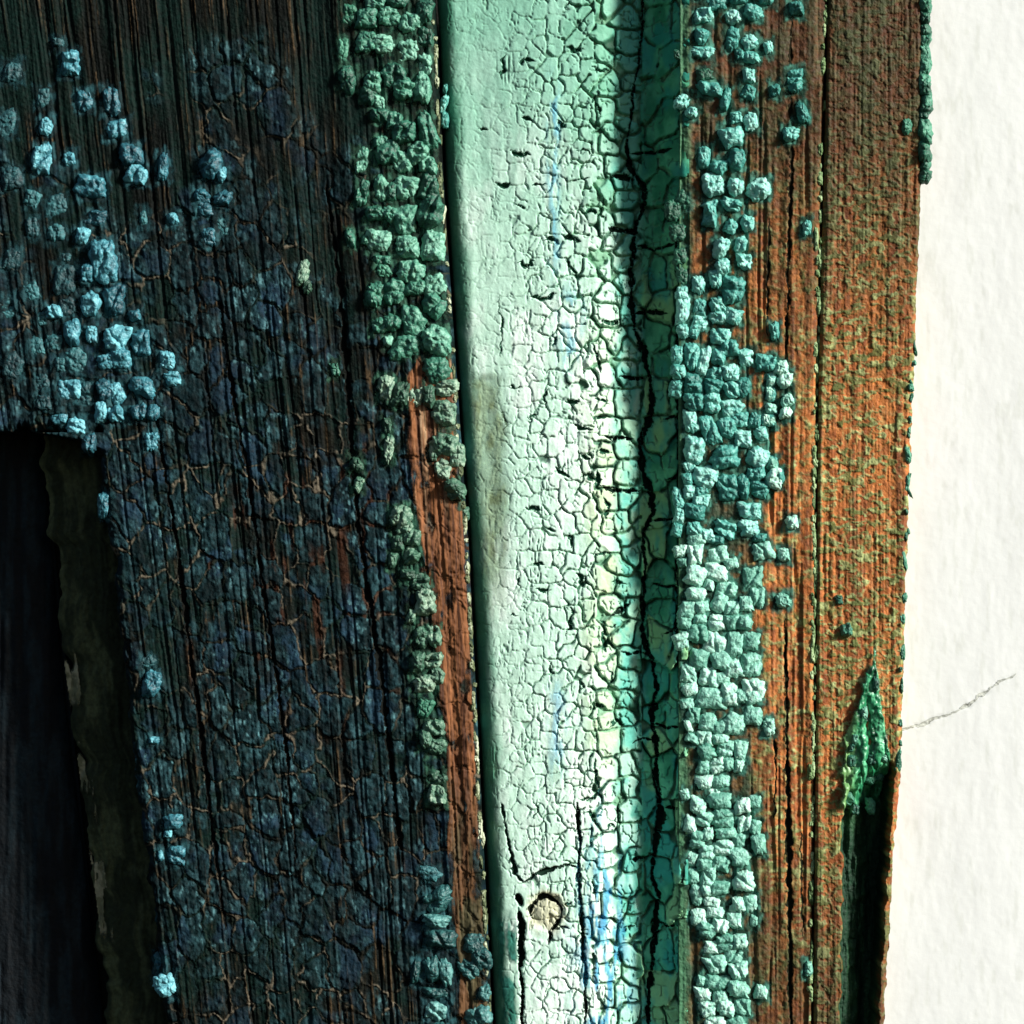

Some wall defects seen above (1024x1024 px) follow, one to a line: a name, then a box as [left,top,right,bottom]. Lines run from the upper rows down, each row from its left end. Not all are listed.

peeling [0,37,185,458]
peeling [151,949,180,1002]
peeling [154,808,191,870]
crack [153,398,227,930]
peeling [164,145,236,251]
crack [220,301,298,866]
crack [325,182,404,865]
peeling [335,0,493,1024]
crack [496,0,685,1024]
peeling [664,0,826,1024]
peeling [839,650,902,815]
peeling [901,0,934,185]